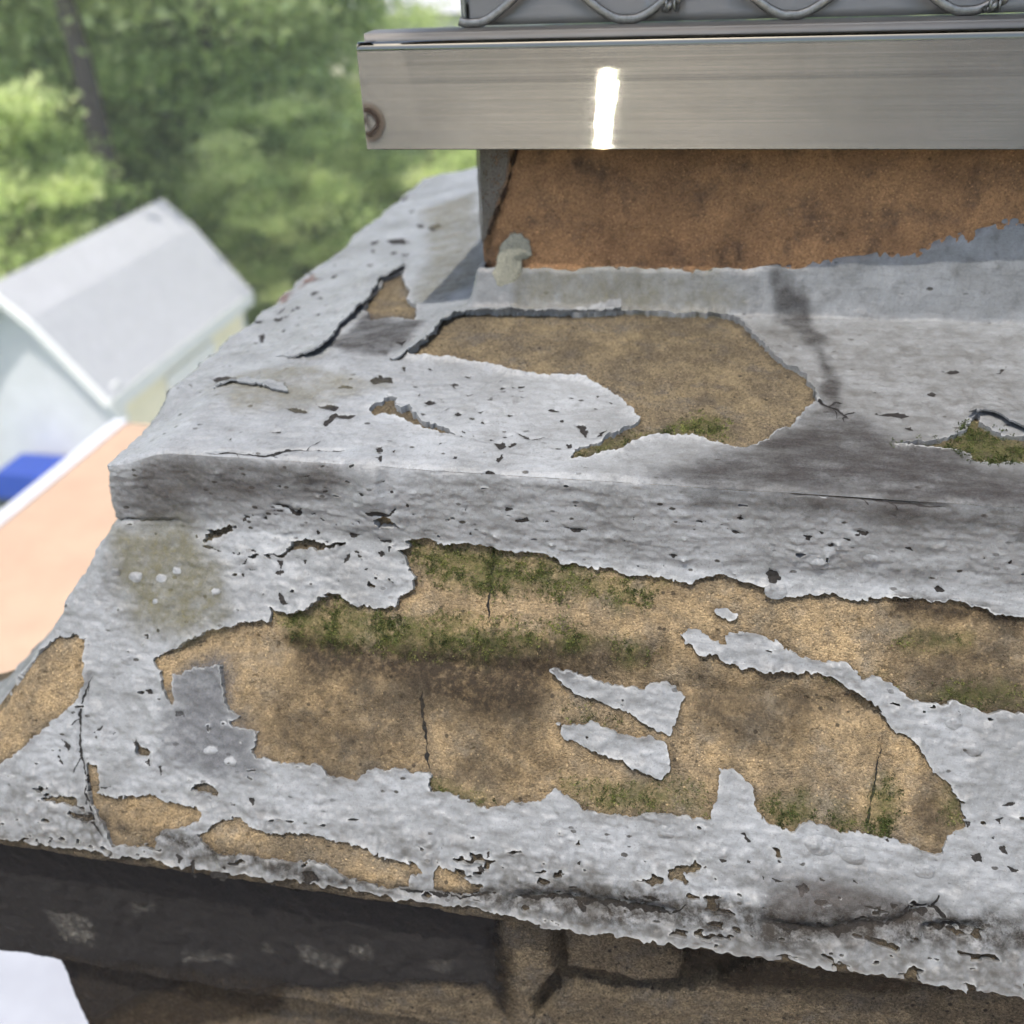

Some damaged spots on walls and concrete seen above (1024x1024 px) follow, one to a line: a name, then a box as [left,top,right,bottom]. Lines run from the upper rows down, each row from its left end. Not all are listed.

peeling [254,238,815,458]
leakage [775,280,839,407]
spalling [485,433,545,474]
peeling [927,399,1024,464]
peeling [202,504,414,577]
peeling [0,634,85,764]
crack [72,676,103,837]
peeling [145,530,1024,854]
peeling [88,763,490,894]